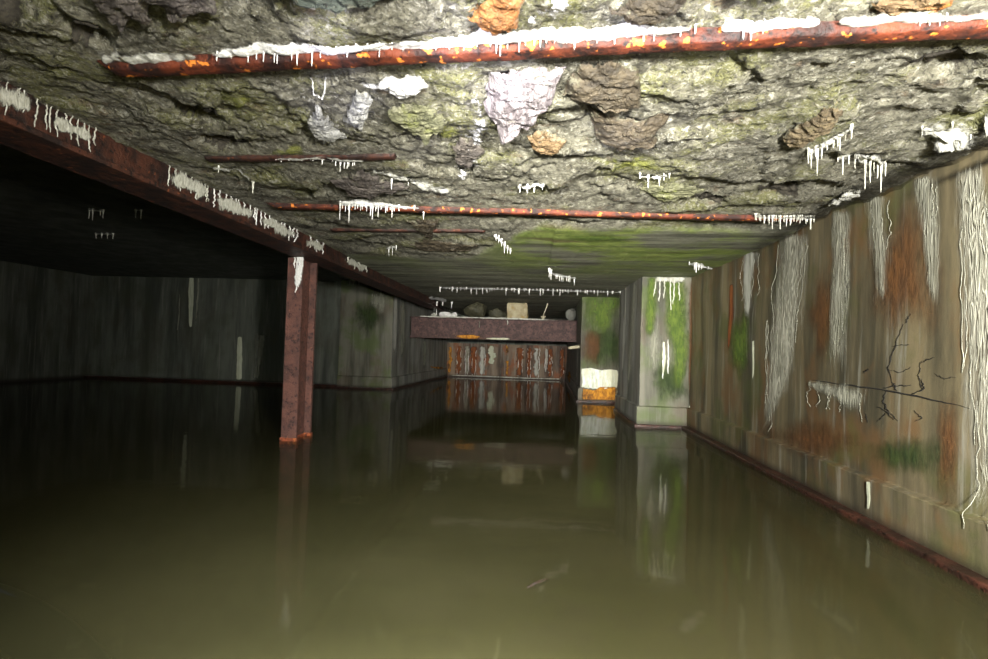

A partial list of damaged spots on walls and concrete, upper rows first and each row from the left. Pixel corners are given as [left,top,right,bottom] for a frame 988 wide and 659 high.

damp [213,0,697,65]
damp [721,17,820,40]
damp [839,11,988,27]
damp [0,82,97,152]
damp [364,74,429,99]
damp [740,252,760,314]
rust [431,335,480,375]
damp [420,268,637,389]
damp [650,321,669,379]
damp [653,277,692,379]
damp [752,116,988,529]